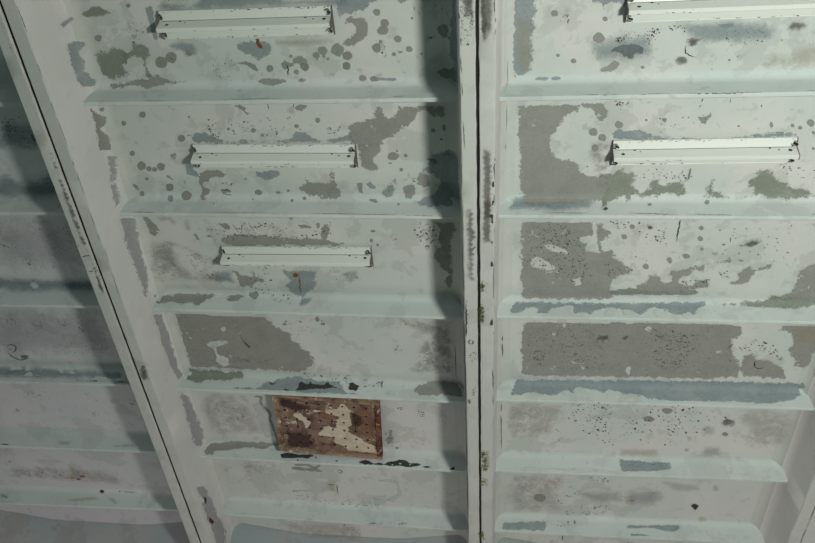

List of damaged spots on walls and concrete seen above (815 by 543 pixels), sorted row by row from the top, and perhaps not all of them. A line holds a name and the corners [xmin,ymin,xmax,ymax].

peeling [348,106,446,171]
peeling [517,103,609,210]
peeling [397,172,430,205]
peeling [519,222,632,301]
peeling [636,264,709,294]
peeling [718,259,772,285]
peeling [776,265,815,301]
peeling [154,293,315,373]
peeling [520,322,787,381]
peeling [780,326,815,368]
spalling [296,382,337,390]